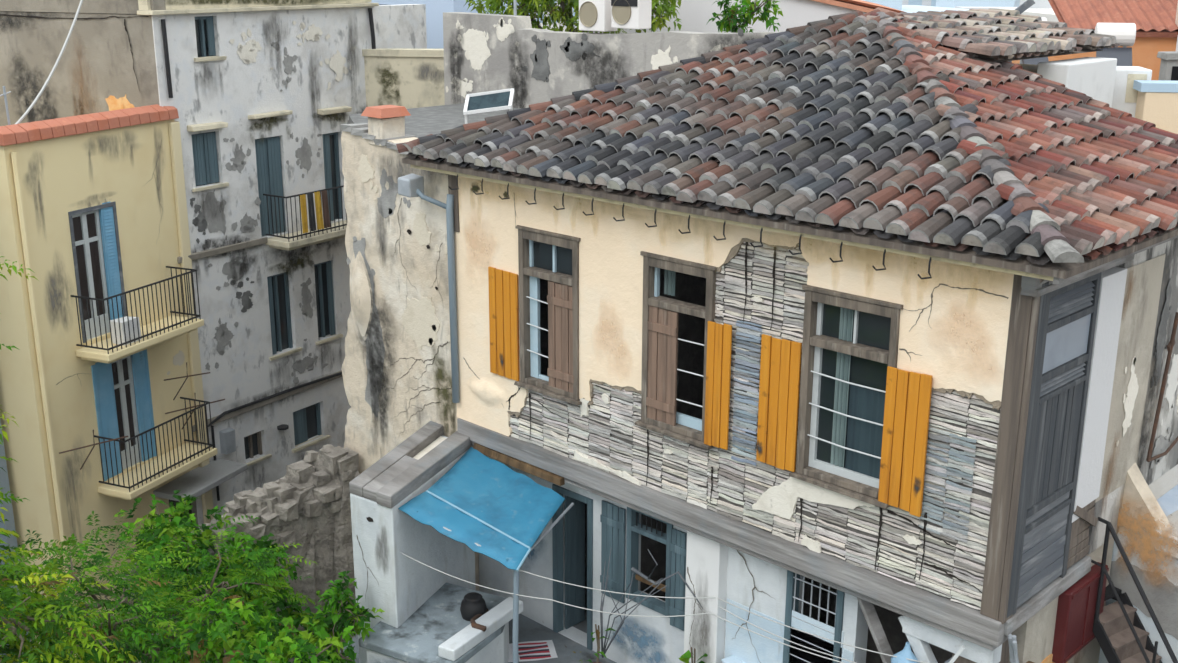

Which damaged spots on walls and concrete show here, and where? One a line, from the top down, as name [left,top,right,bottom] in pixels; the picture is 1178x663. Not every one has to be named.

flaking render [446,17,600,99]
damp [250,116,288,130]
damp [316,113,345,121]
mould [192,236,255,278]
damp [277,241,335,274]
crack [899,283,1009,362]
flaking render [1116,278,1178,469]
crack [734,550,776,663]
peeling [1110,503,1178,640]